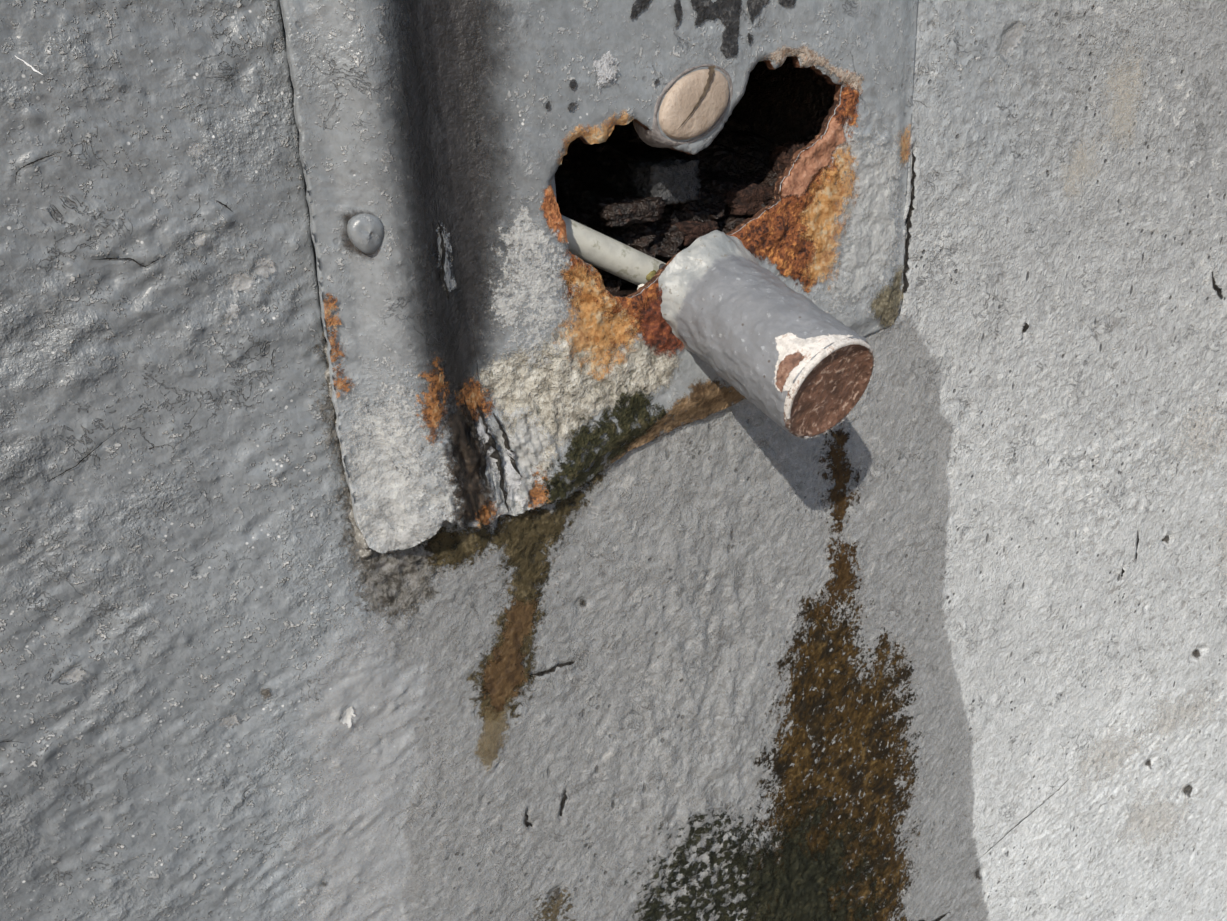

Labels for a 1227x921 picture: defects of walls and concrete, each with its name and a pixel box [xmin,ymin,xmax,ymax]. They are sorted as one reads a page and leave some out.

peeling [568,80,577,111]
corrosion [560,112,633,163]
peeling [593,51,620,89]
corrosion [729,45,864,292]
corrosion [541,184,684,381]
crack [1212,272,1223,299]
corrosion [323,293,354,398]
corrosion [416,356,495,443]
crack [464,400,522,512]
corrosion [605,379,745,467]
leakage [814,426,863,620]
leakage [710,788,896,921]